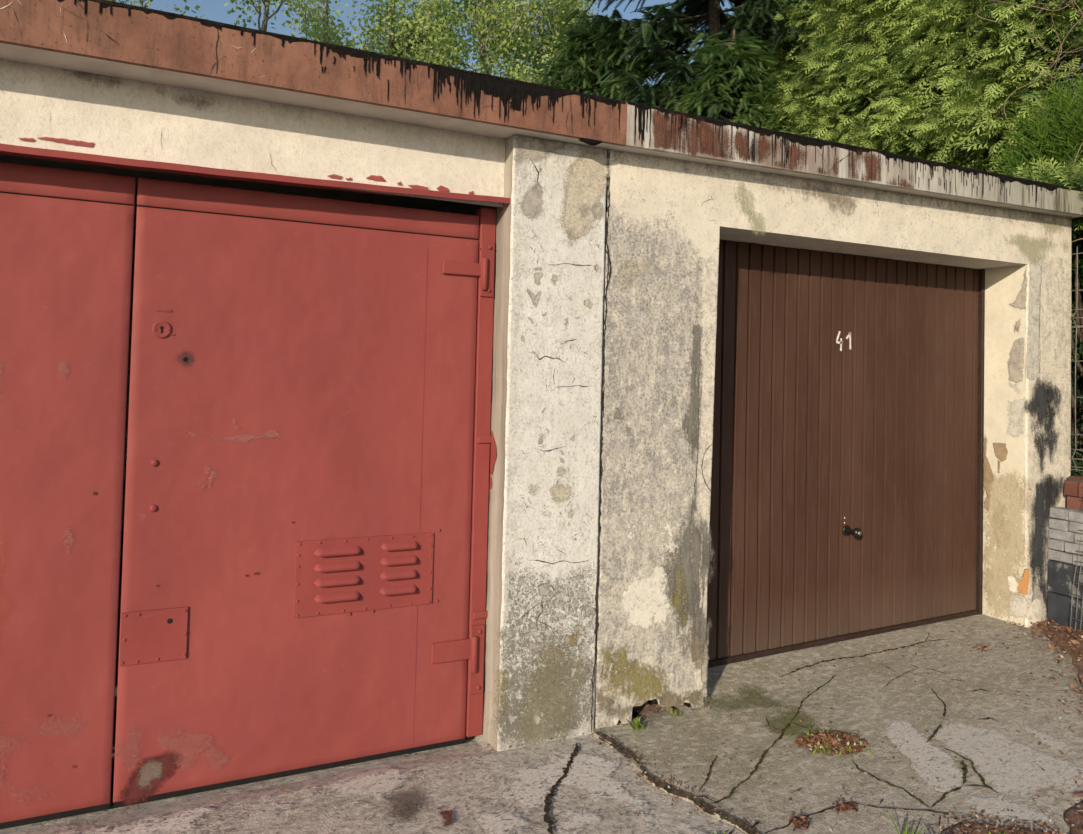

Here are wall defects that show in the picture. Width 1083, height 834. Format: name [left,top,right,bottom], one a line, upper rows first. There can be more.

peeling [397,182,449,191]
peeling [521,183,543,219]
spalling [560,149,610,245]
rust [651,110,911,188]
damp [682,325,703,459]
spalling [983,266,1040,510]
crack [512,150,1000,834]
damp [1035,407,1063,506]
damp [984,475,1035,616]
damp [597,689,631,717]
damp [602,645,629,675]
damp [659,690,706,708]